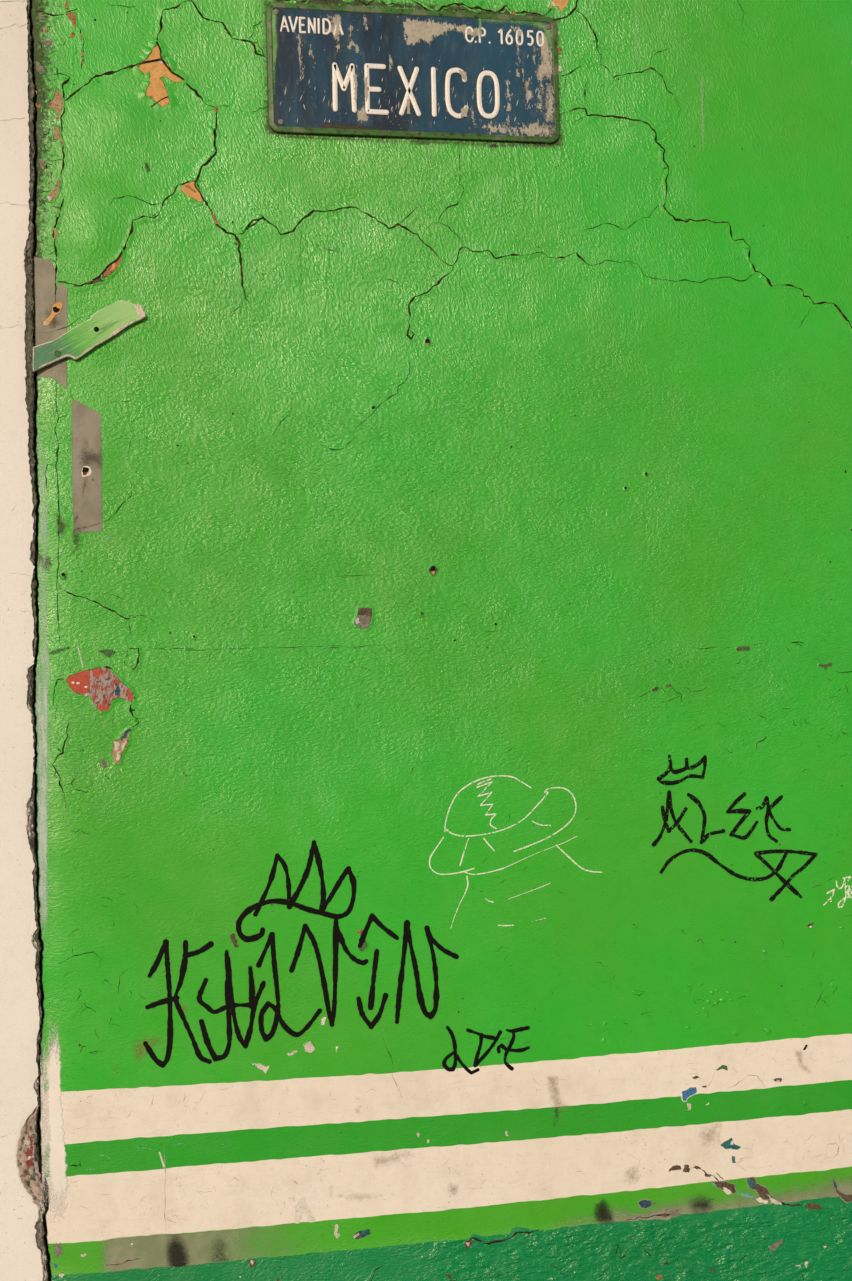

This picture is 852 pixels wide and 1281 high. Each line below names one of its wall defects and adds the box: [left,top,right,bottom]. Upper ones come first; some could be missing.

peeling [547,0,572,13]
peeling [128,37,190,112]
peeling [178,177,220,225]
crack [0,0,852,450]
peeling [92,246,127,283]
spalling [17,0,102,1281]
spalling [351,605,375,632]
peeling [61,648,137,715]
peeling [100,725,134,772]
peeling [681,1076,709,1111]
peeling [668,1164,782,1205]
peeling [831,1178,852,1203]